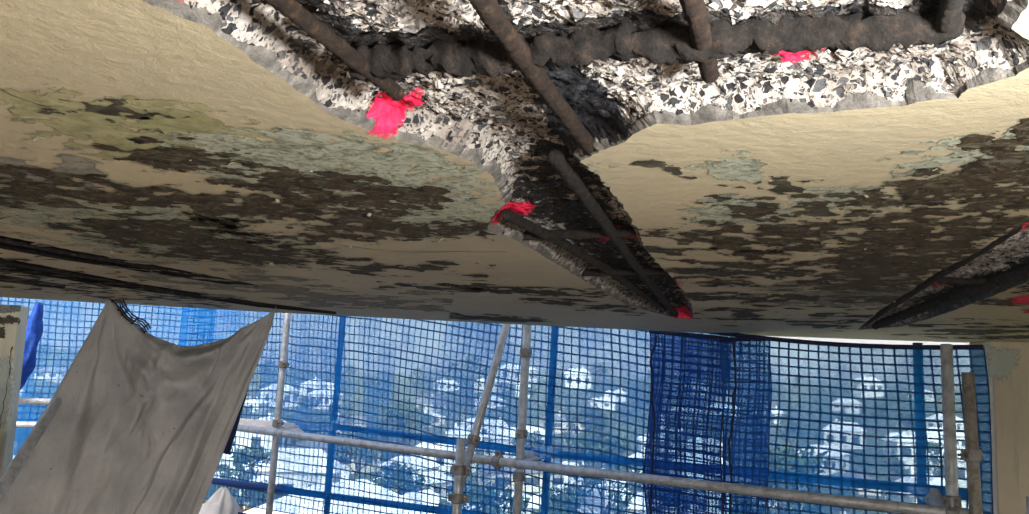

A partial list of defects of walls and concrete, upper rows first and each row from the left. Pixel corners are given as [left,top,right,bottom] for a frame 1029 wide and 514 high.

spalling [0,0,1029,330]
water stain [684,281,913,329]
water stain [886,282,1029,341]